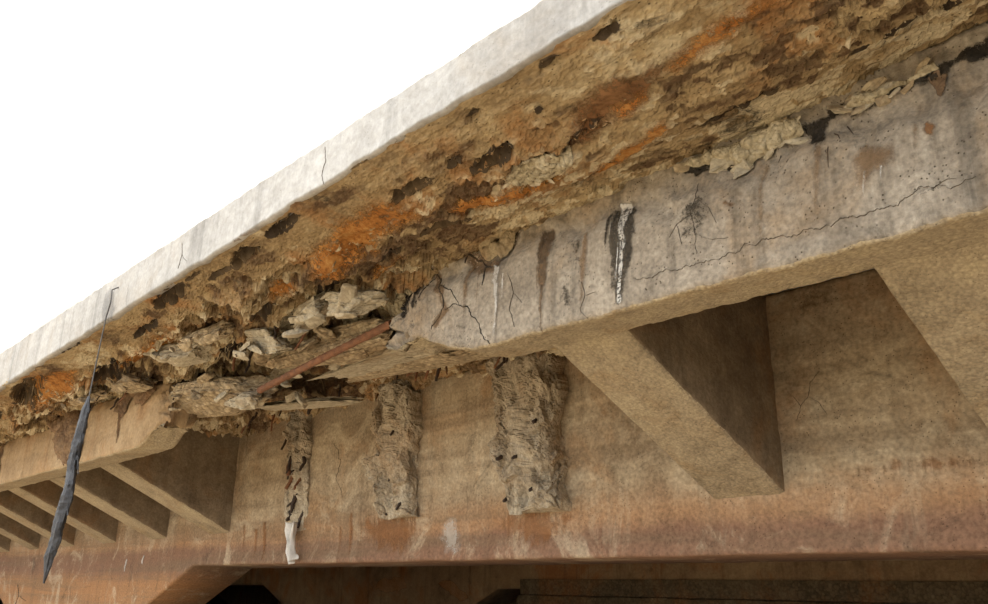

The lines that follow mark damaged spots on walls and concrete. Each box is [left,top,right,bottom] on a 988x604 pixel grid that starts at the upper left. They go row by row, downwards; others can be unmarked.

corrosion [595,124,668,173]
peeling [673,115,810,179]
spalling [133,213,301,339]
corrosion [309,202,416,281]
crack [415,268,490,344]
crack [464,232,521,325]
corrosion [452,177,564,218]
leakage [536,230,555,318]
leakage [604,204,636,304]
leakage [681,193,708,237]
crack [635,176,976,280]
spalling [142,279,508,434]